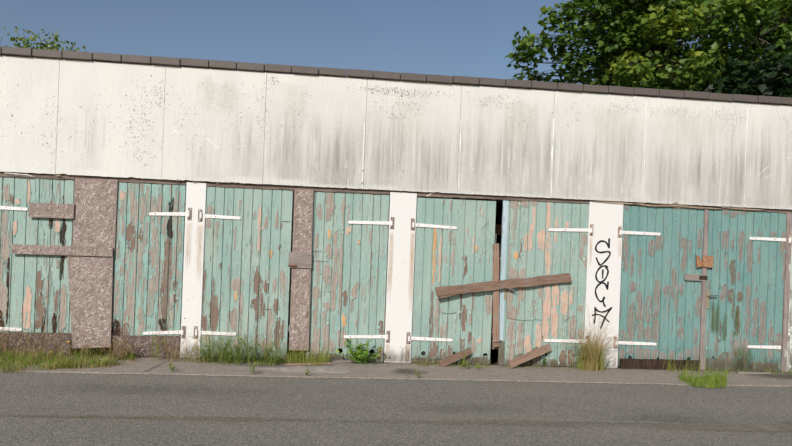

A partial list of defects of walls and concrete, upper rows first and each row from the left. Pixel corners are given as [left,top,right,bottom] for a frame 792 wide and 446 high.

peeling [20,218,67,333]
peeling [112,179,185,336]
peeling [201,199,290,357]
peeling [308,192,386,362]
peeling [411,197,496,364]
peeling [618,202,792,371]